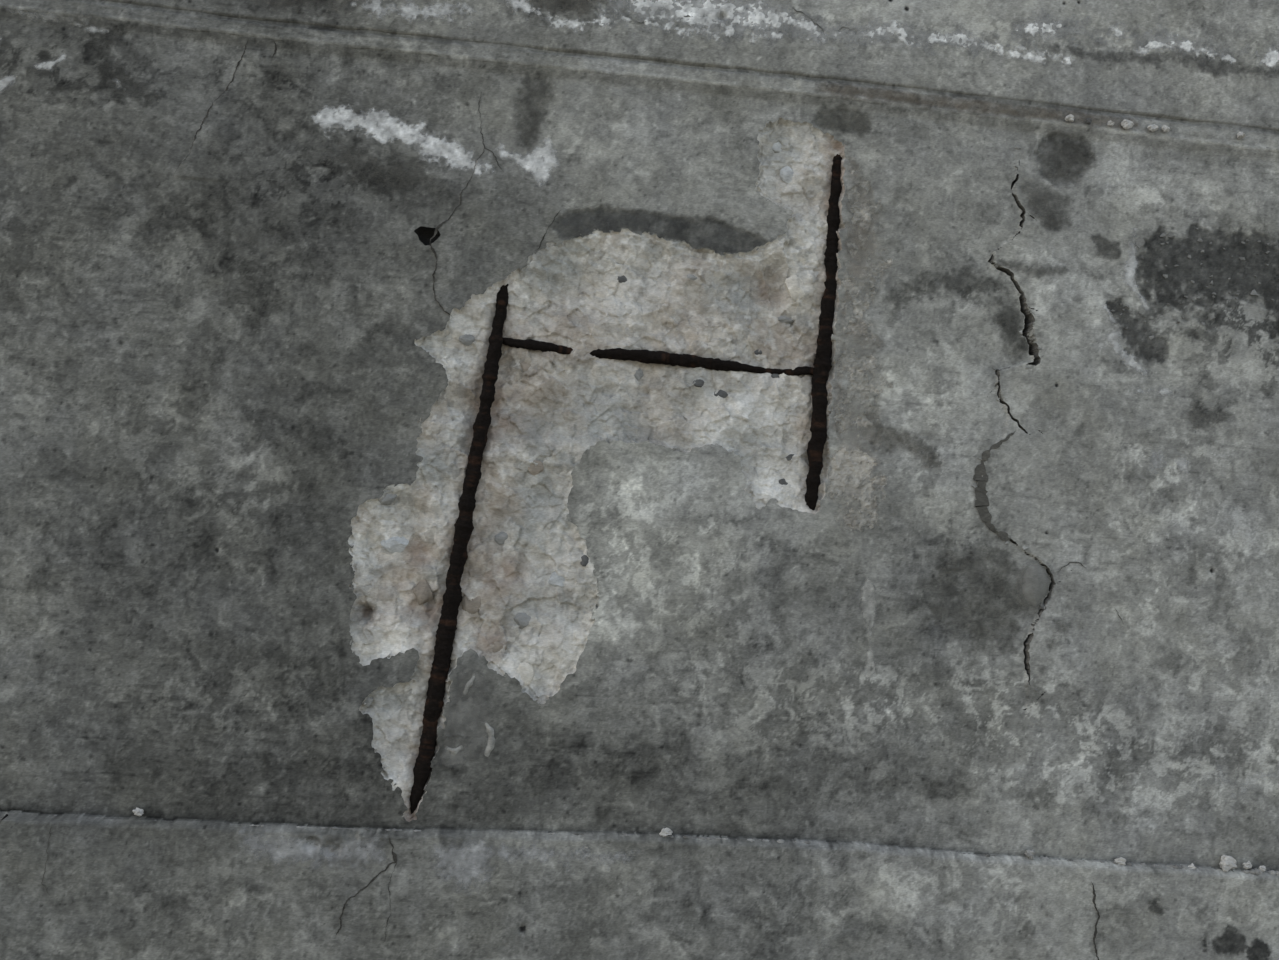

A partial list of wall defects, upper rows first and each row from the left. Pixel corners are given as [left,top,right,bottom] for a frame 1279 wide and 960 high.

crack [175,39,277,172]
water stain [314,81,557,182]
crack [414,97,504,315]
water stain [506,0,1236,76]
water stain [1022,134,1092,230]
water stain [1255,46,1279,74]
rust [590,154,842,510]
water stain [1107,225,1279,363]
spalling [348,118,893,822]
crack [972,145,1084,710]
rust [410,284,573,814]
water stain [1203,925,1271,960]